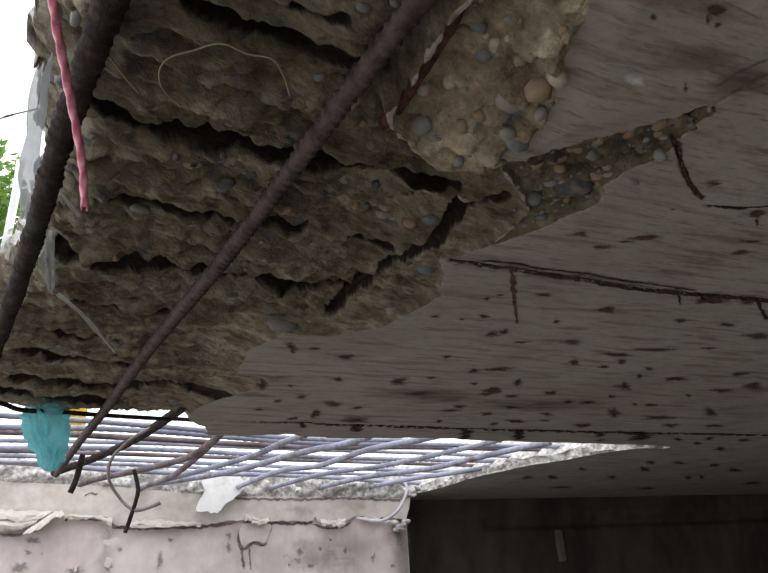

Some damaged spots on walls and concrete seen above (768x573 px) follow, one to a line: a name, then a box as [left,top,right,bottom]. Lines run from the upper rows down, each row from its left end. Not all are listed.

crack [669,134,768,210]
spalling [0,0,715,484]
corrosion [510,266,519,323]
crack [450,258,768,320]
crack [272,421,768,440]
flaking render [0,433,133,535]
flaking render [105,413,669,547]
crack [0,530,37,538]
crack [65,518,350,570]